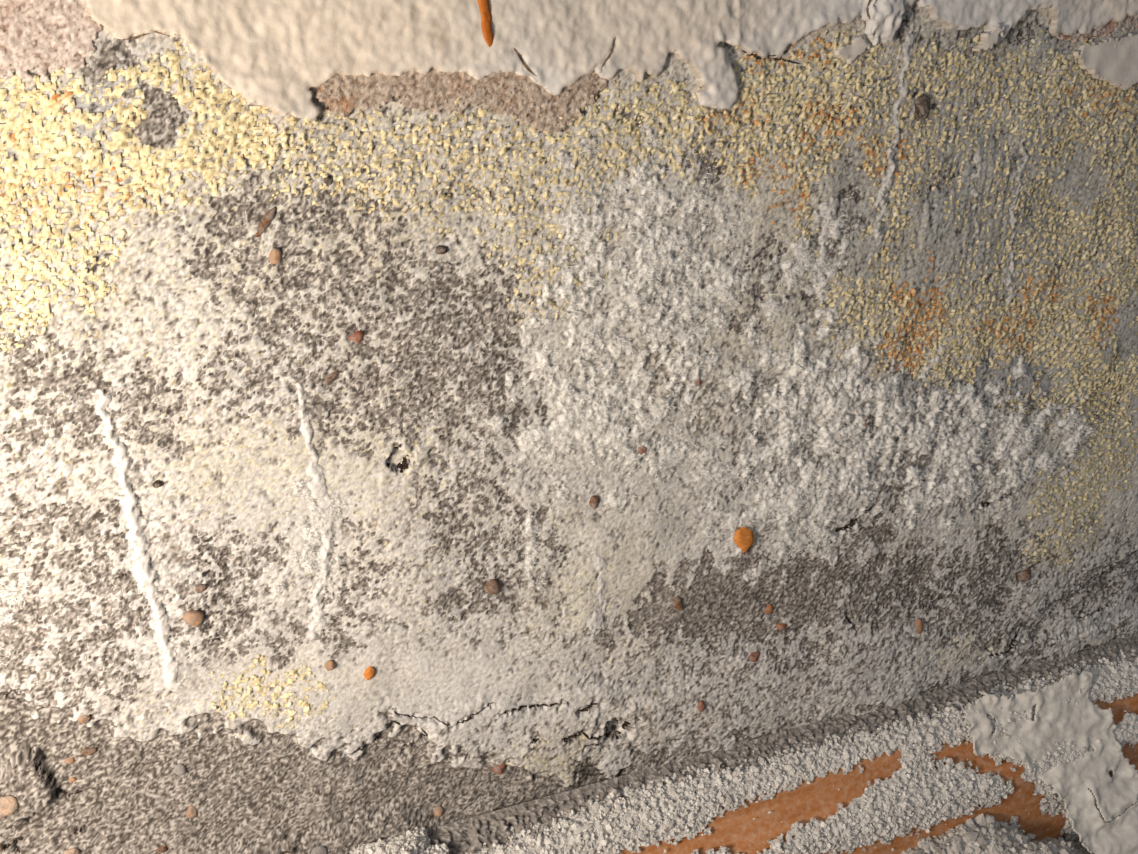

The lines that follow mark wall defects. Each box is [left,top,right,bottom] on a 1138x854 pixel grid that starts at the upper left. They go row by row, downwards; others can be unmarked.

corrosion [478,0,493,47]
spalling [682,133,728,186]
spalling [811,185,866,276]
leakage [0,6,1138,595]
spalling [717,234,831,335]
spalling [0,162,569,625]
efflorescence [95,389,186,692]
leakage [284,383,349,643]
leakage [0,557,32,632]
leakage [586,550,607,635]
leakage [0,646,15,684]
spalling [0,455,1138,854]